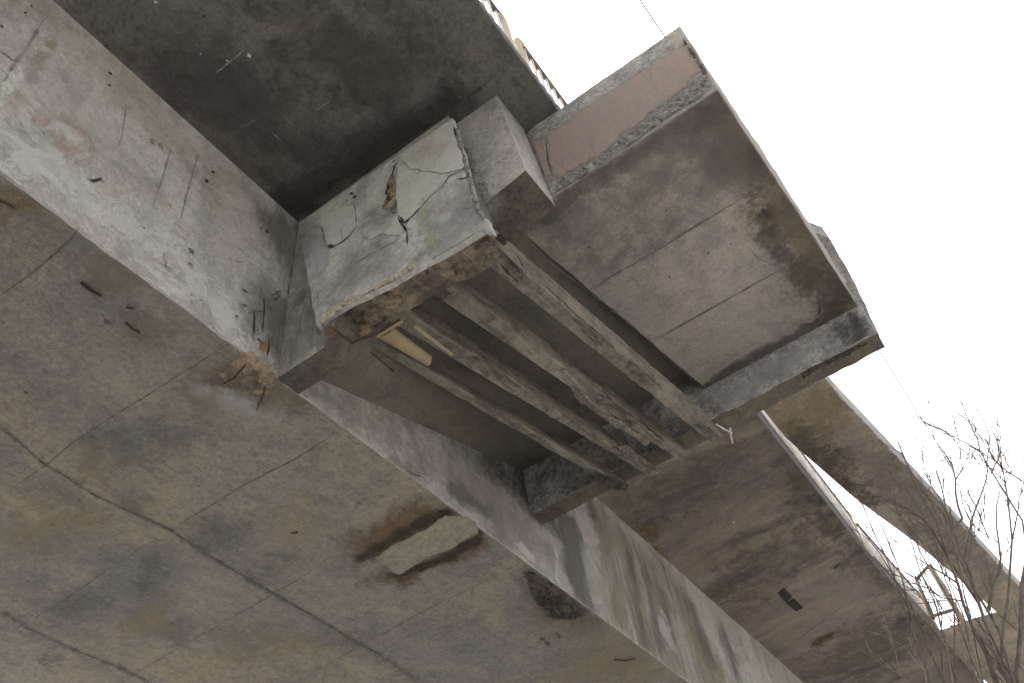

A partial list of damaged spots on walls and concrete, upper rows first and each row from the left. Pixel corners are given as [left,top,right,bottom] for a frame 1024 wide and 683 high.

spalling [555,39,714,193]
crack [321,125,469,264]
damp [531,91,870,418]
spalling [203,351,280,411]
spalling [570,386,660,475]
rust [355,501,452,563]
rust [377,529,486,588]